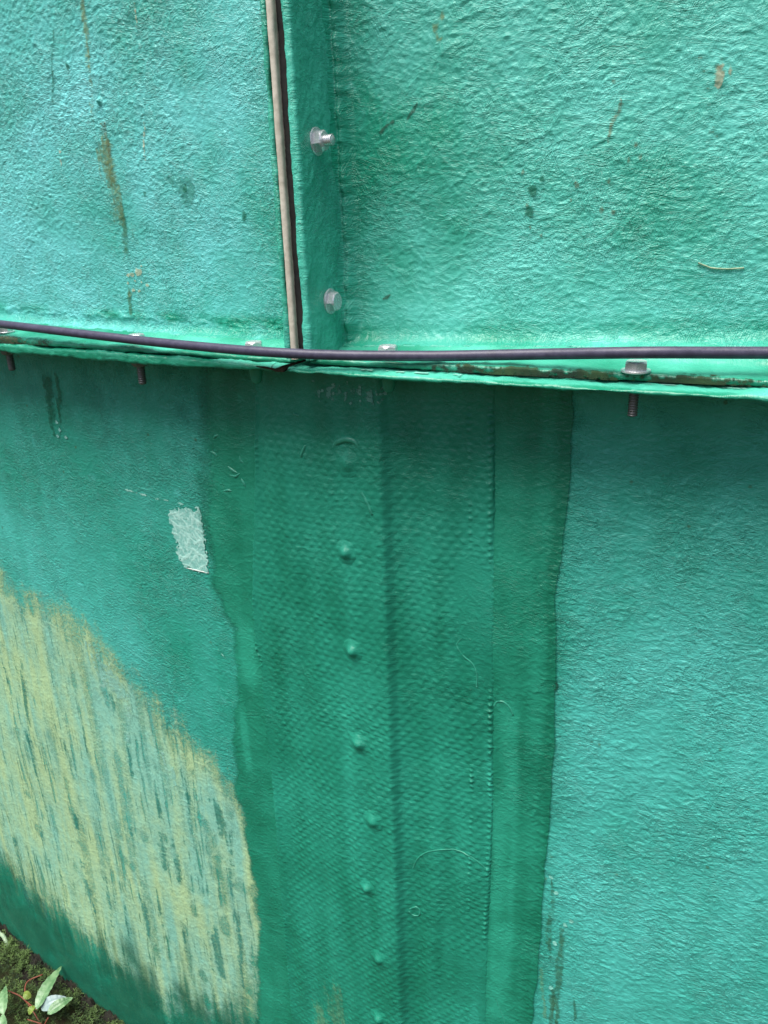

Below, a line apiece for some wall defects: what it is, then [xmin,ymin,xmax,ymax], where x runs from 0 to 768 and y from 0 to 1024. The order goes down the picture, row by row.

rust [97,137,127,253]
rust [126,265,149,315]
peeling [168,506,209,574]